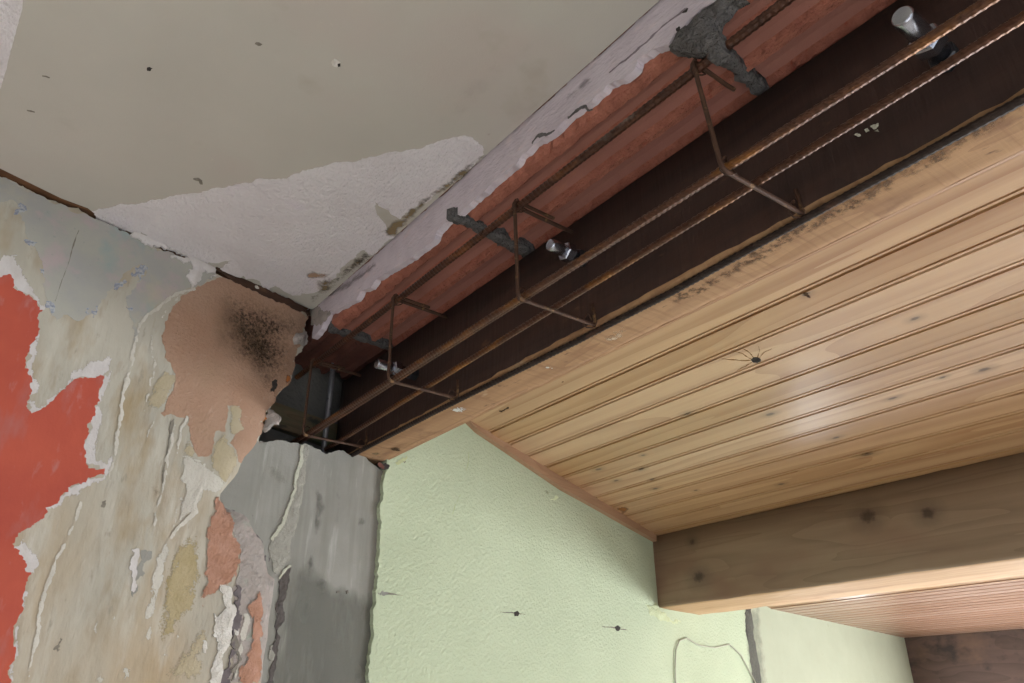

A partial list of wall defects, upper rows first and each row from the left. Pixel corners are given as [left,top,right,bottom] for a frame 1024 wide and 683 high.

spalling [0,0,1024,463]
leakage [236,309,281,367]
spalling [129,548,152,597]
spalling [202,497,275,683]